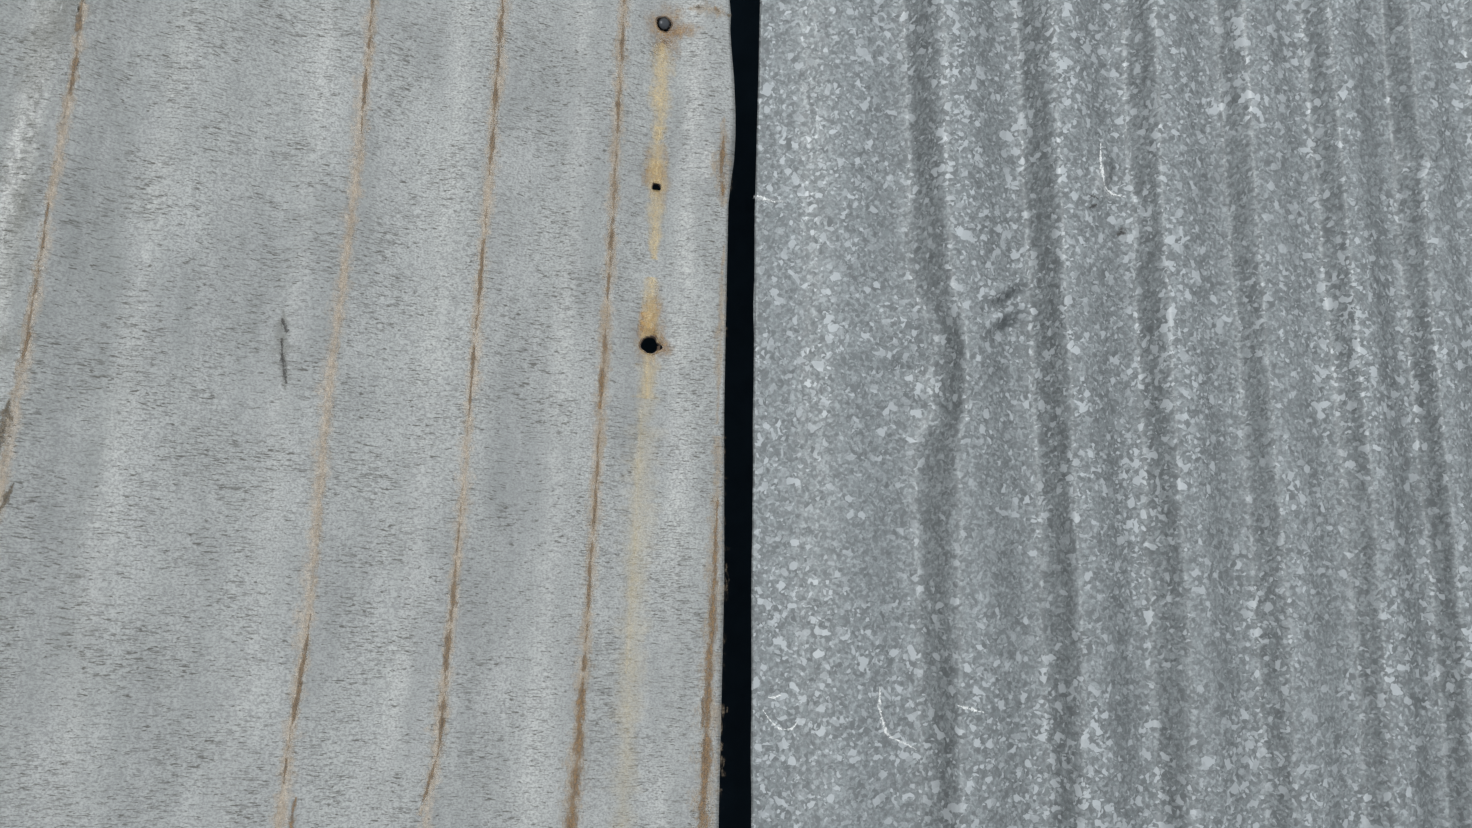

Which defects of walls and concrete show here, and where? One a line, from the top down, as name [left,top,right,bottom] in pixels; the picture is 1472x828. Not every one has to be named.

corrosion [67,2,86,113]
corrosion [351,0,374,197]
corrosion [0,188,54,454]
corrosion [466,0,504,451]
corrosion [566,0,628,828]
corrosion [640,277,665,351]
corrosion [289,531,315,726]
corrosion [423,476,465,823]
corrosion [279,746,296,828]